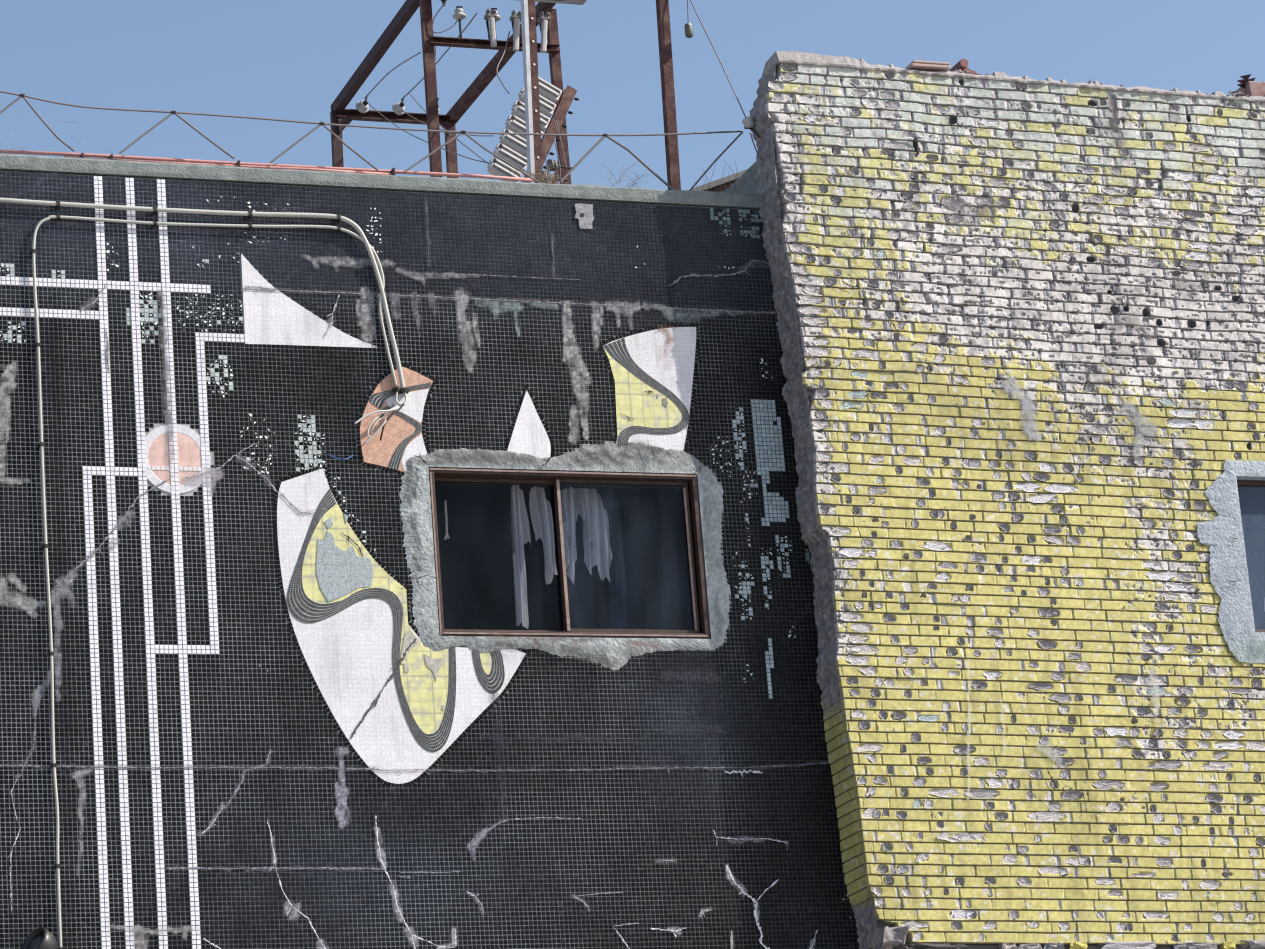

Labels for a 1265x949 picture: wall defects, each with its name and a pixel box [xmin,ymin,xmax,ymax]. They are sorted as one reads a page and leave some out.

spalling [932,105,1034,211]
spalling [1049,148,1153,229]
leakage [356,288,412,341]
leakage [456,292,671,462]
peeling [712,399,813,620]
spalling [787,211,1265,907]
peeling [744,638,774,699]
crack [0,638,829,912]
crack [166,815,581,949]
crack [614,910,709,949]
crack [713,830,788,949]
spalling [998,891,1179,949]